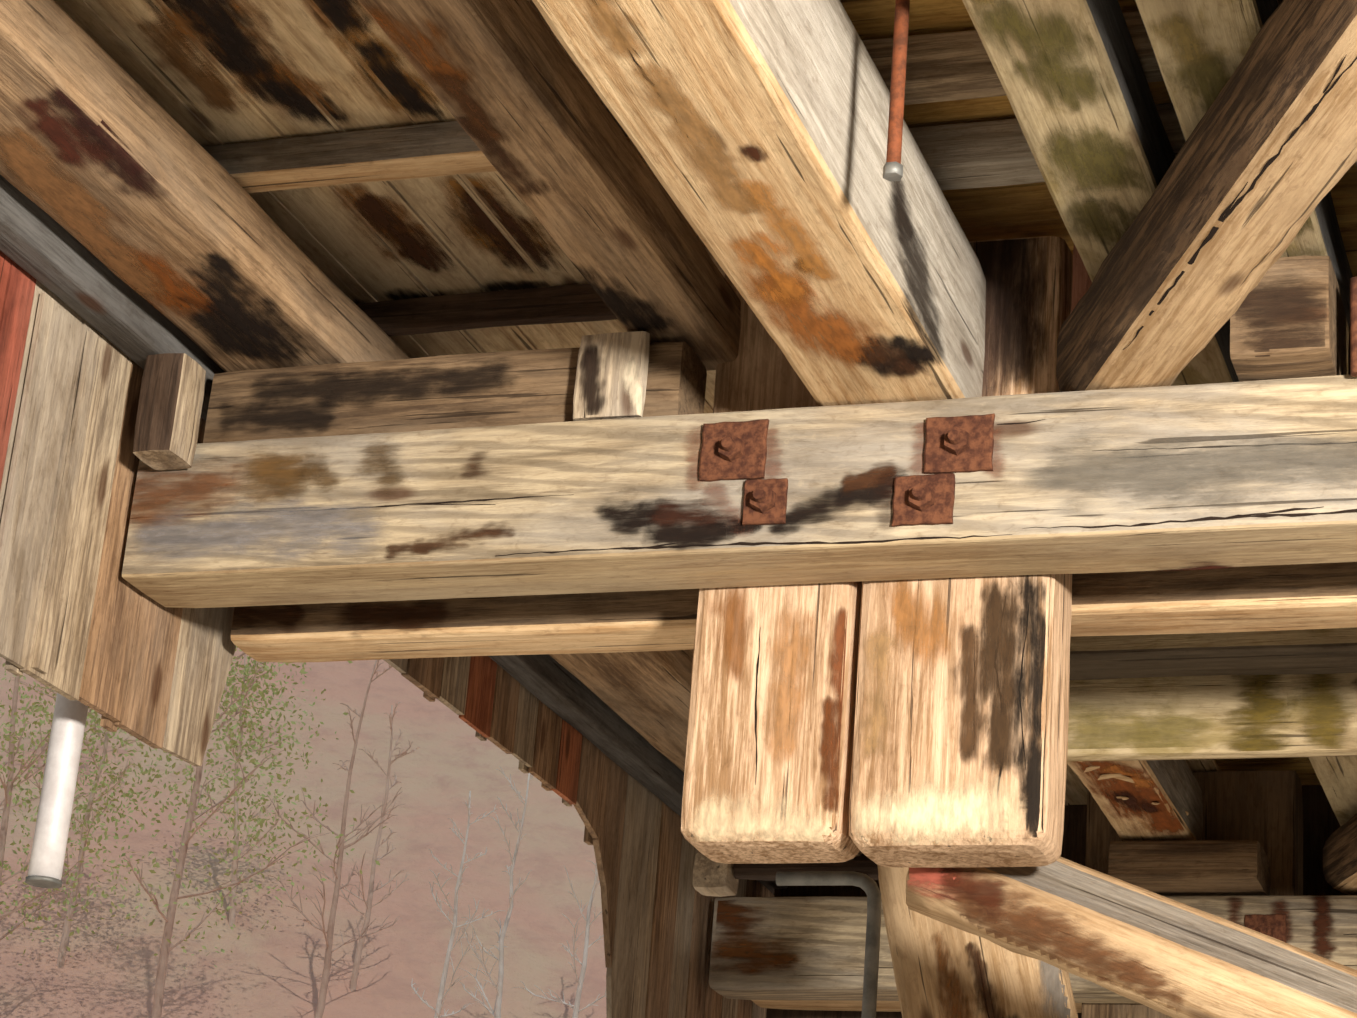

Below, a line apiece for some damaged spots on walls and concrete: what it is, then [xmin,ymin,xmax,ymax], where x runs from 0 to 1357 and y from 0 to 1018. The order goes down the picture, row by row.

damp [141,0,348,124]
mould [977,0,1097,111]
mould [1049,129,1148,245]
crack [1123,54,1357,350]
damp [862,575,1050,838]